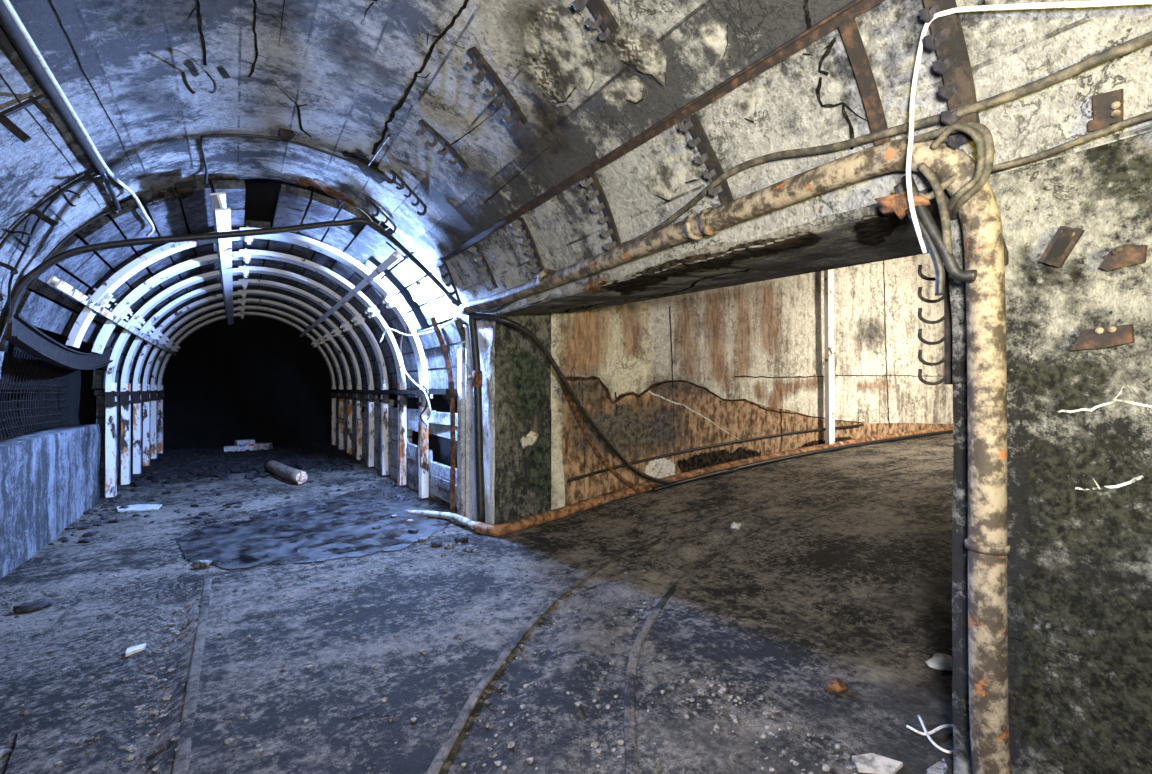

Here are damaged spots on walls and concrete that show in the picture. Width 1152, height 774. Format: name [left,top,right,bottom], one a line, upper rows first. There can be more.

crack [187,0,207,65]
crack [237,0,312,137]
crack [803,0,869,150]
corrosion [566,312,607,373]
corrosion [707,287,775,384]
damp [511,351,545,420]
damp [1009,357,1125,416]
spalling [645,446,761,478]
damp [1008,436,1152,774]